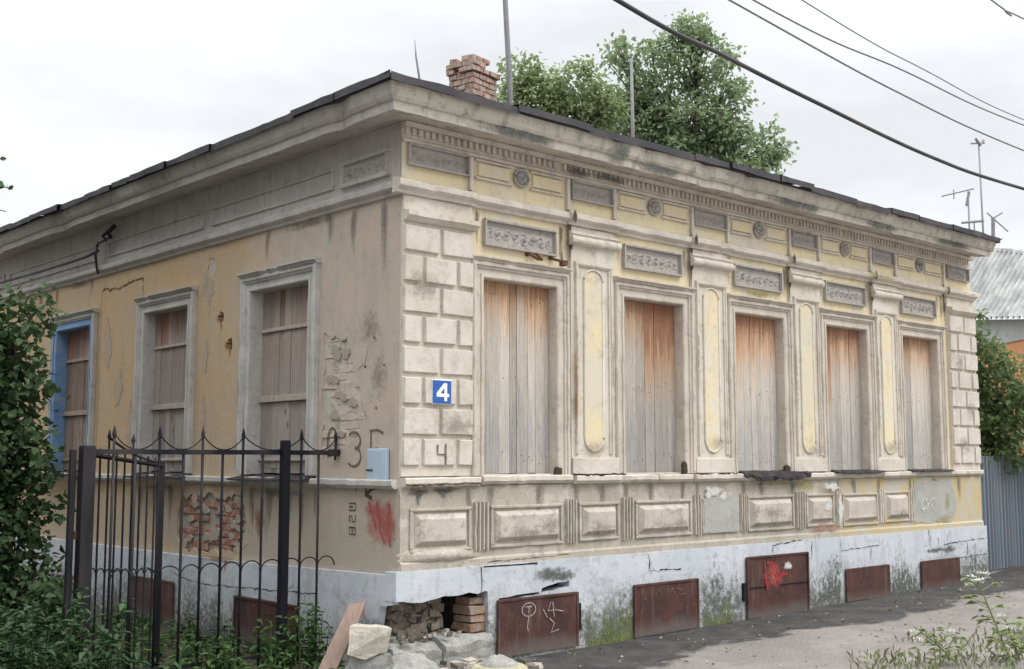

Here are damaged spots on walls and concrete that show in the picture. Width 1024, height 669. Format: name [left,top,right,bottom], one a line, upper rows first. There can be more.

crack [99,277,144,343]
flaking render [322,331,366,466]
flaking render [177,490,250,555]
peeling [705,486,727,500]
crack [481,553,565,592]
damp [702,564,743,627]